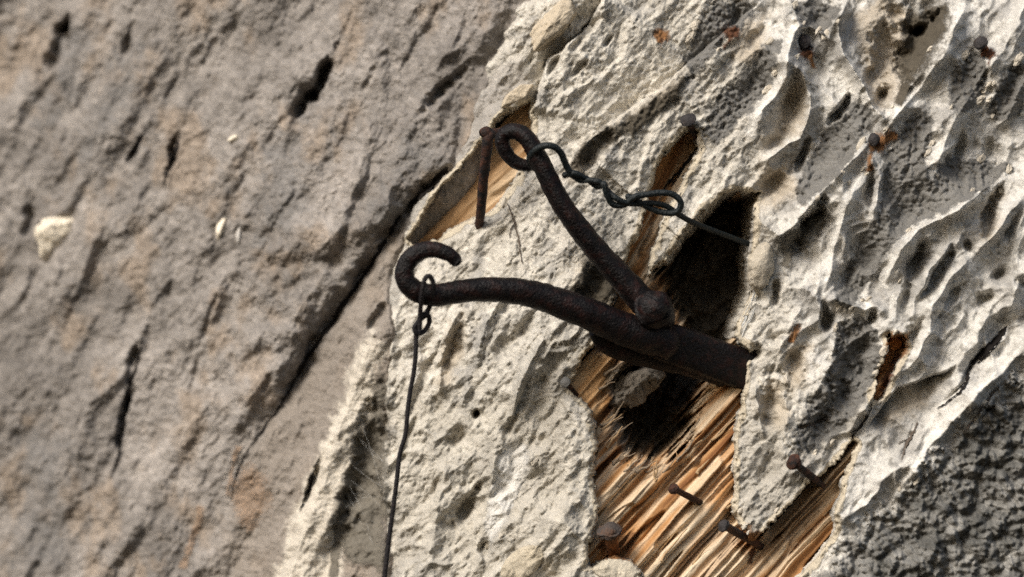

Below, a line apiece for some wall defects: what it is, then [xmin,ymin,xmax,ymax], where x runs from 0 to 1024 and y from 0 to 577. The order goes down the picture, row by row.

corrosion [654,28,670,43]
corrosion [799,49,815,68]
flaking render [404,96,538,246]
flaking render [623,0,843,274]
corrosion [866,132,898,172]
flaking render [564,338,600,571]
corrosion [880,332,909,392]
crack [898,326,1007,460]